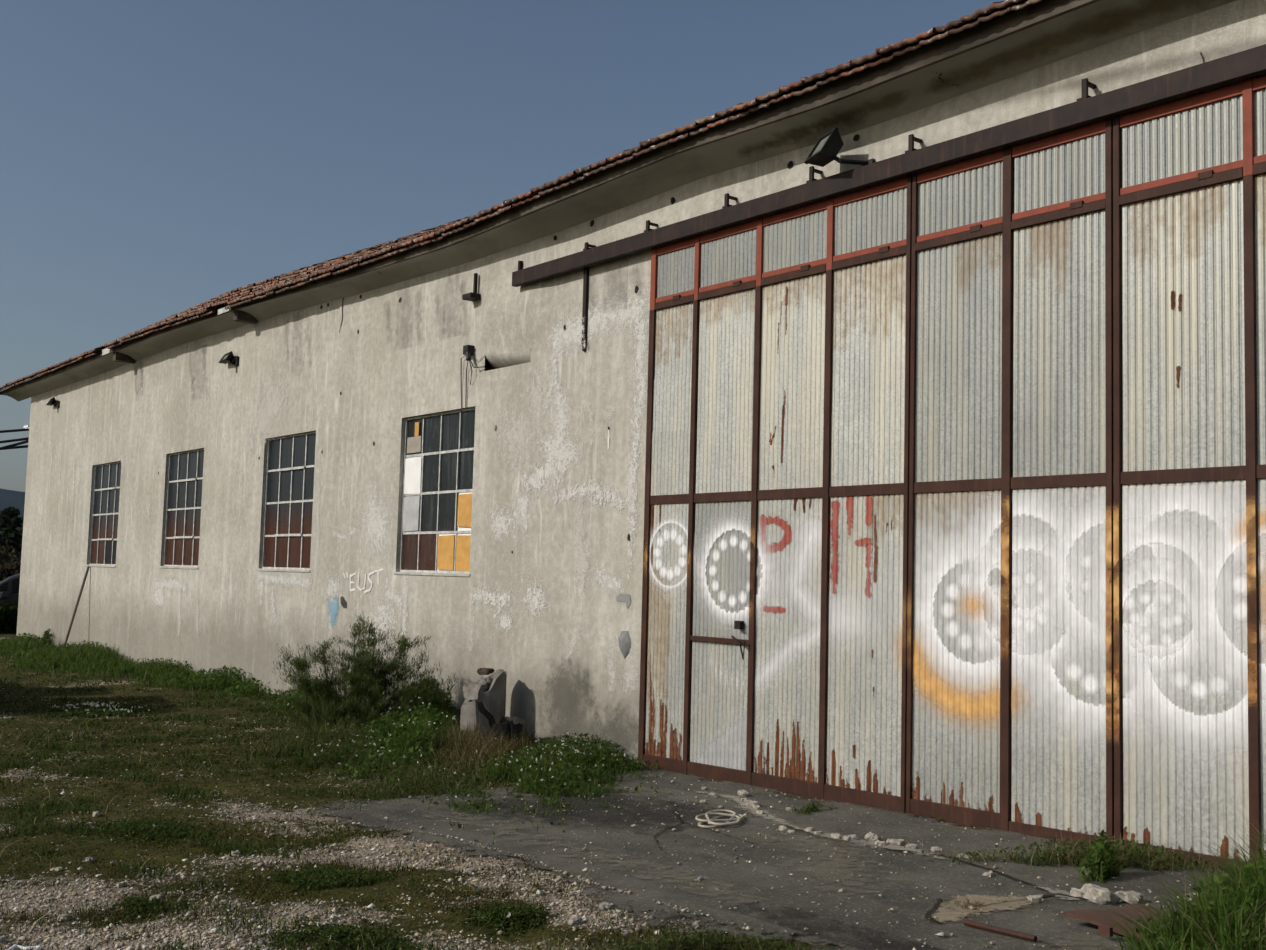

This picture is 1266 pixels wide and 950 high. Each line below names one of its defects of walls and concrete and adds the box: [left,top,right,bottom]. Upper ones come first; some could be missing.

corrosion [645,654,682,760]
corrosion [754,719,892,795]
corrosion [912,773,994,812]
corrosion [1015,803,1042,826]
corrosion [1123,827,1150,844]
corrosion [1220,836,1240,860]